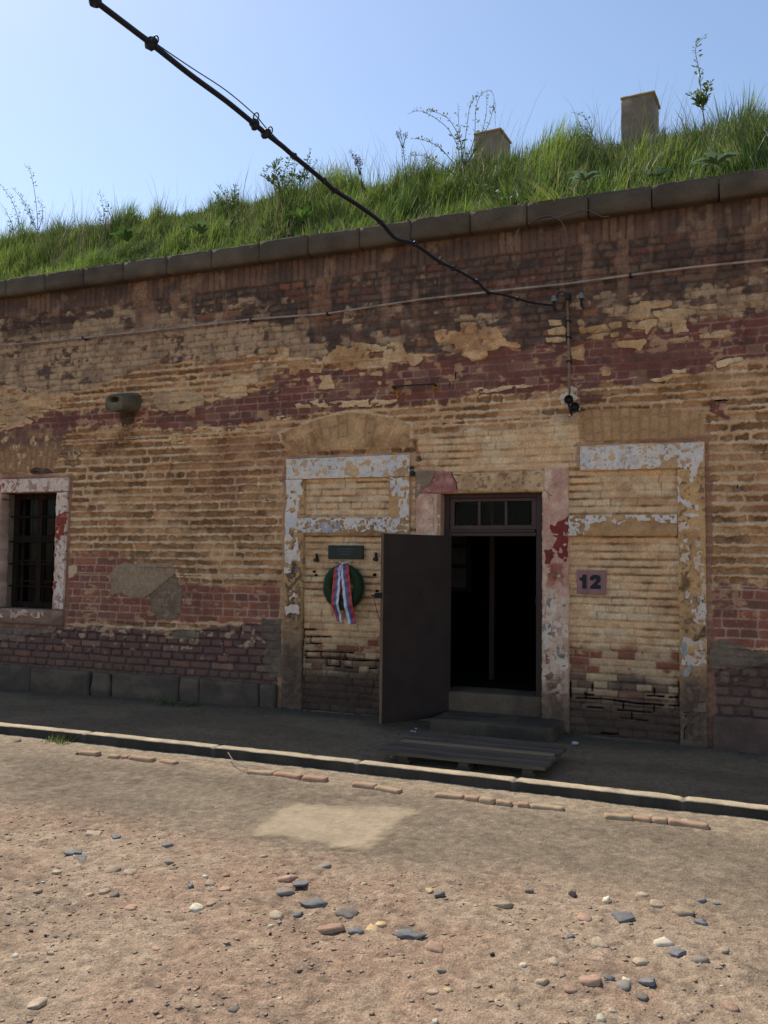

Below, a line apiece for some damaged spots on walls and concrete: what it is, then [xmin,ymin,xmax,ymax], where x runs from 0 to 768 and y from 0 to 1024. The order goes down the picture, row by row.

peeling [434,322,521,362]
peeling [546,299,766,361]
peeling [217,341,423,421]
peeling [473,384,533,396]
peeling [0,467,69,516]
peeling [284,455,410,574]
peeling [568,443,707,625]
peeling [0,537,66,618]
peeling [285,590,301,616]
peeling [542,566,569,687]
peeling [680,637,707,678]